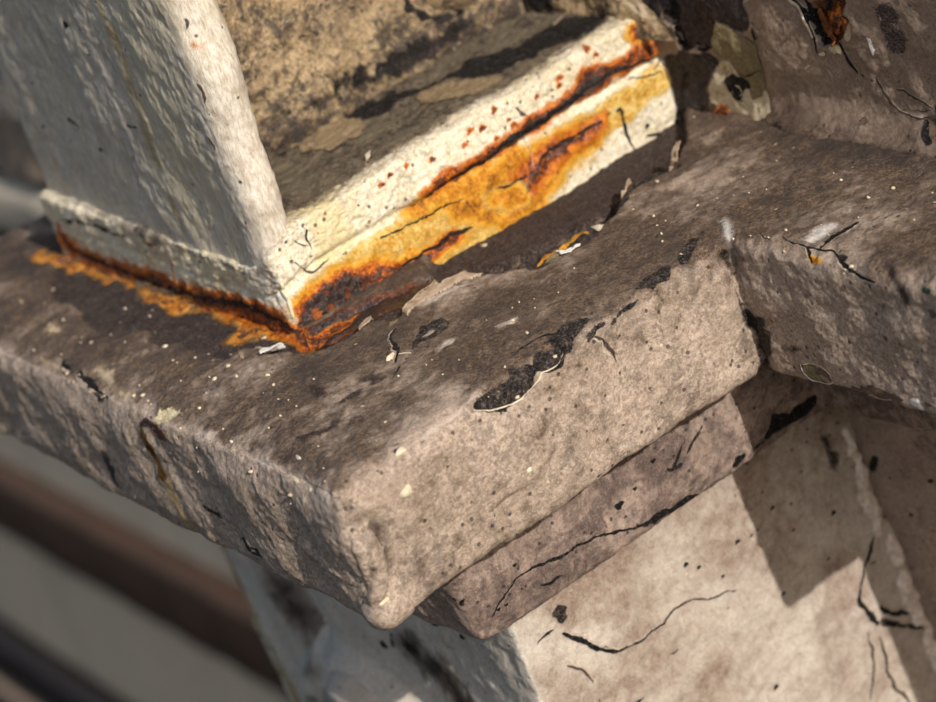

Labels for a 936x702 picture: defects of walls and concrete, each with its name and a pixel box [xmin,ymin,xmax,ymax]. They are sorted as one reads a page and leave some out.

peeling [294,117,368,153]
corrosion [30,64,672,353]
peeling [317,0,782,351]
corrosion [623,22,652,45]
crack [743,0,936,145]
peeling [406,238,699,450]
damp [822,436,839,470]
damp [853,443,878,472]
crack [538,590,737,702]
crack [857,537,923,702]